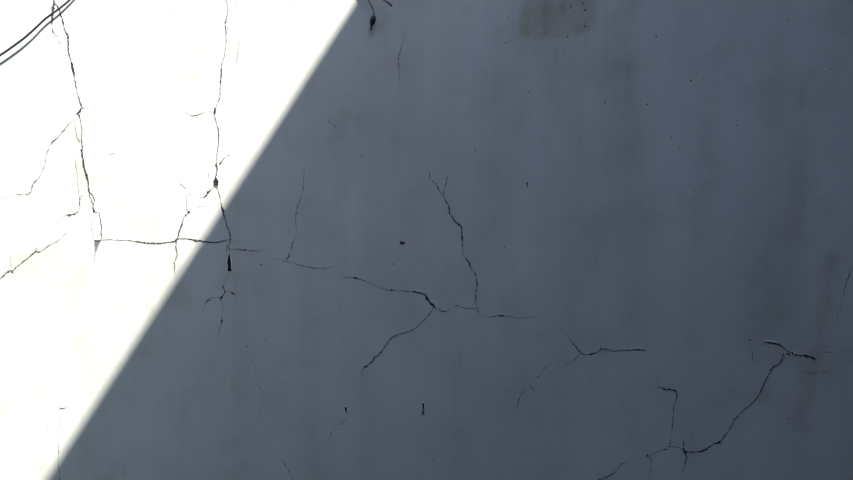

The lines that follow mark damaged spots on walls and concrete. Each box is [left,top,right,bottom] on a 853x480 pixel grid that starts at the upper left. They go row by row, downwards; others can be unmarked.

crack [0,0,534,378]
crack [517,332,646,415]
crack [598,339,846,480]